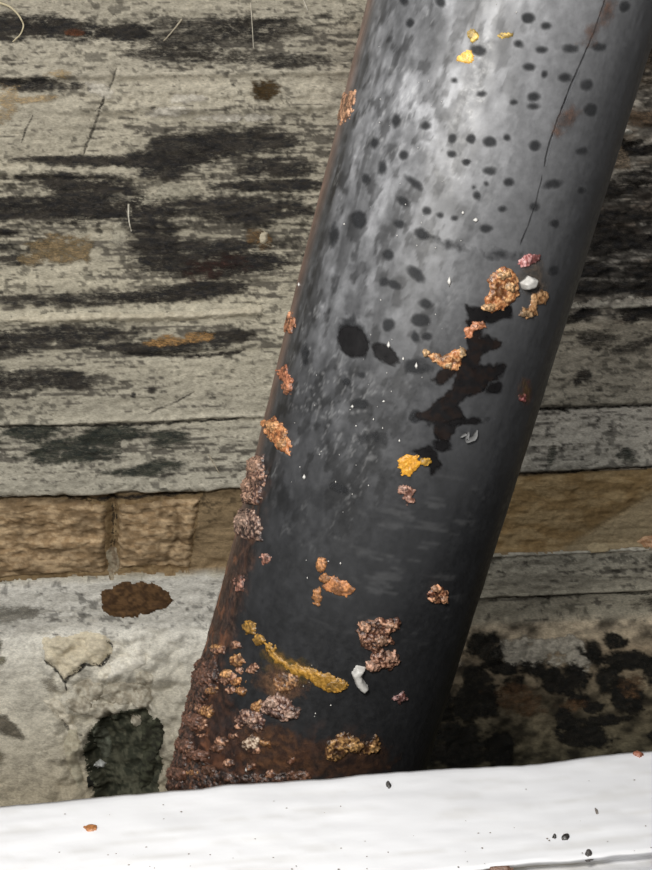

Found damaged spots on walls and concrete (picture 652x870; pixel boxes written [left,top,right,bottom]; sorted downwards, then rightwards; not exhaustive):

crack [538,0,605,190]
water stain [0,94,322,307]
water stain [0,368,101,398]
water stain [0,323,253,357]
rust [422,253,549,371]
water stain [465,304,512,326]
rust [398,454,432,506]
rust [311,557,355,606]
spalling [43,650,165,798]
rust [165,620,387,791]
rust [355,617,401,673]
water stain [428,631,652,769]